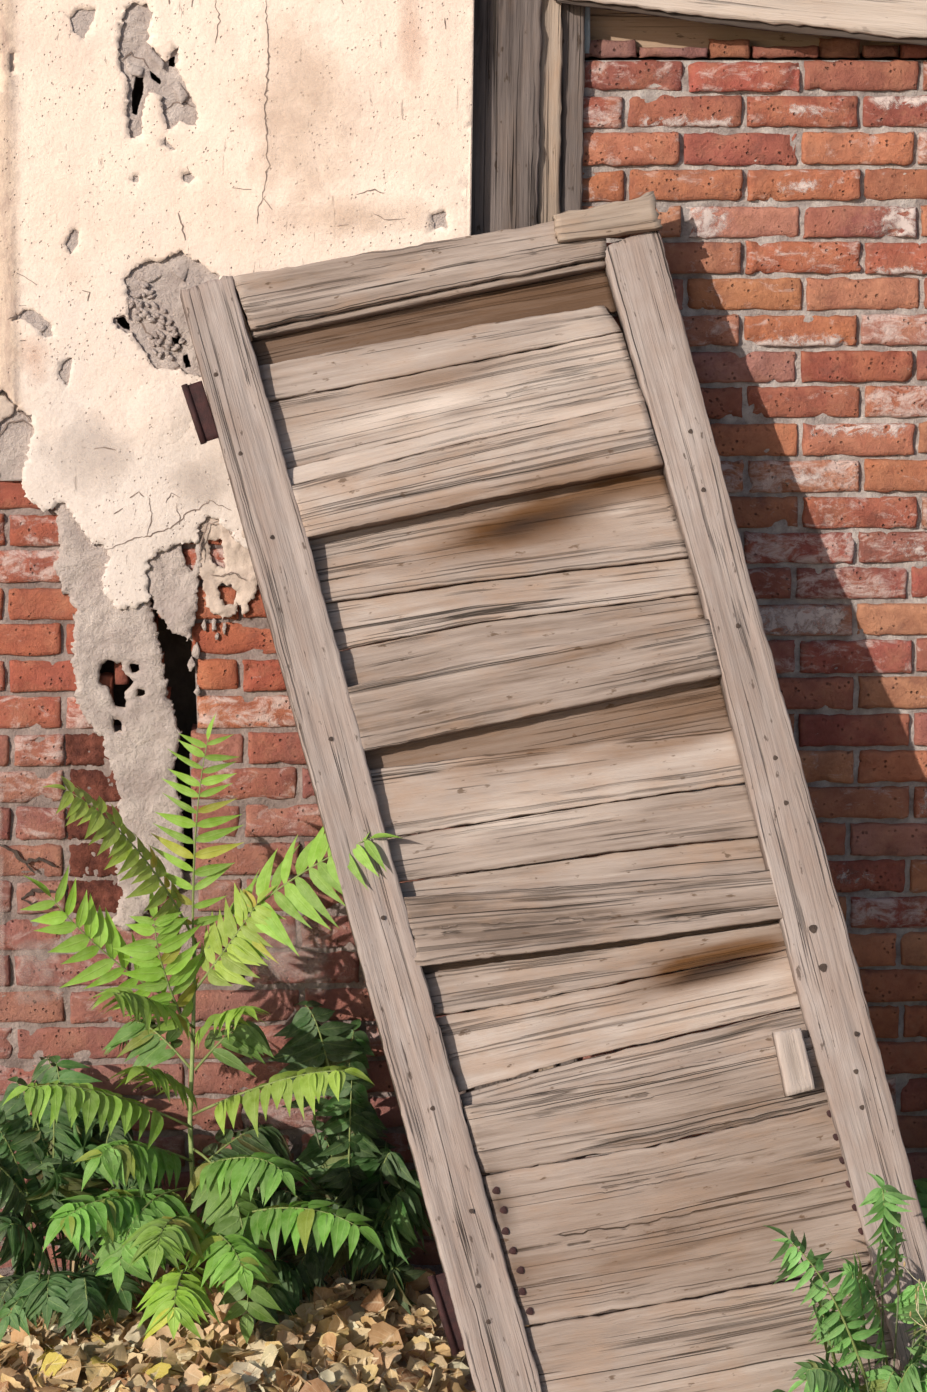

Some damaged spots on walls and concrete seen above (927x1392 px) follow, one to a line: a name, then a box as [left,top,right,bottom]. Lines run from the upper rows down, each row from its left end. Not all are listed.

flaking render [118,2,198,150]
crack [237,4,273,222]
crack [357,189,405,221]
flaking render [113,250,220,377]
flaking render [0,390,34,481]
peeling [53,503,259,931]